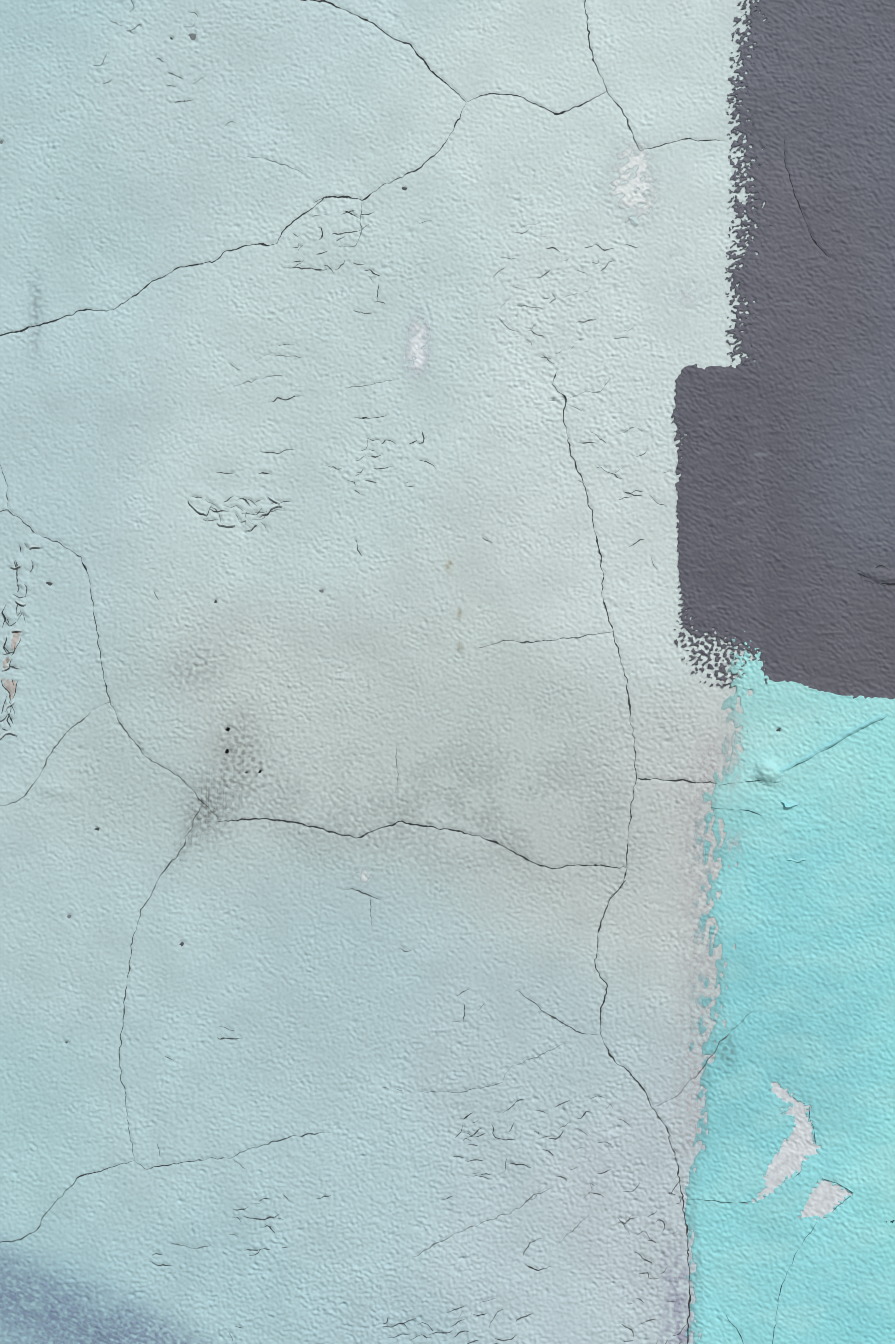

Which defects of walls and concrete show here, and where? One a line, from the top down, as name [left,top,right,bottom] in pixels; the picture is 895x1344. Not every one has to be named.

crack [0,0,720,336]
peeling [0,544,41,740]
crack [0,244,761,1344]
crack [779,712,888,773]
peeling [746,1082,821,1205]
peeling [798,1178,853,1220]
crack [726,1229,813,1344]